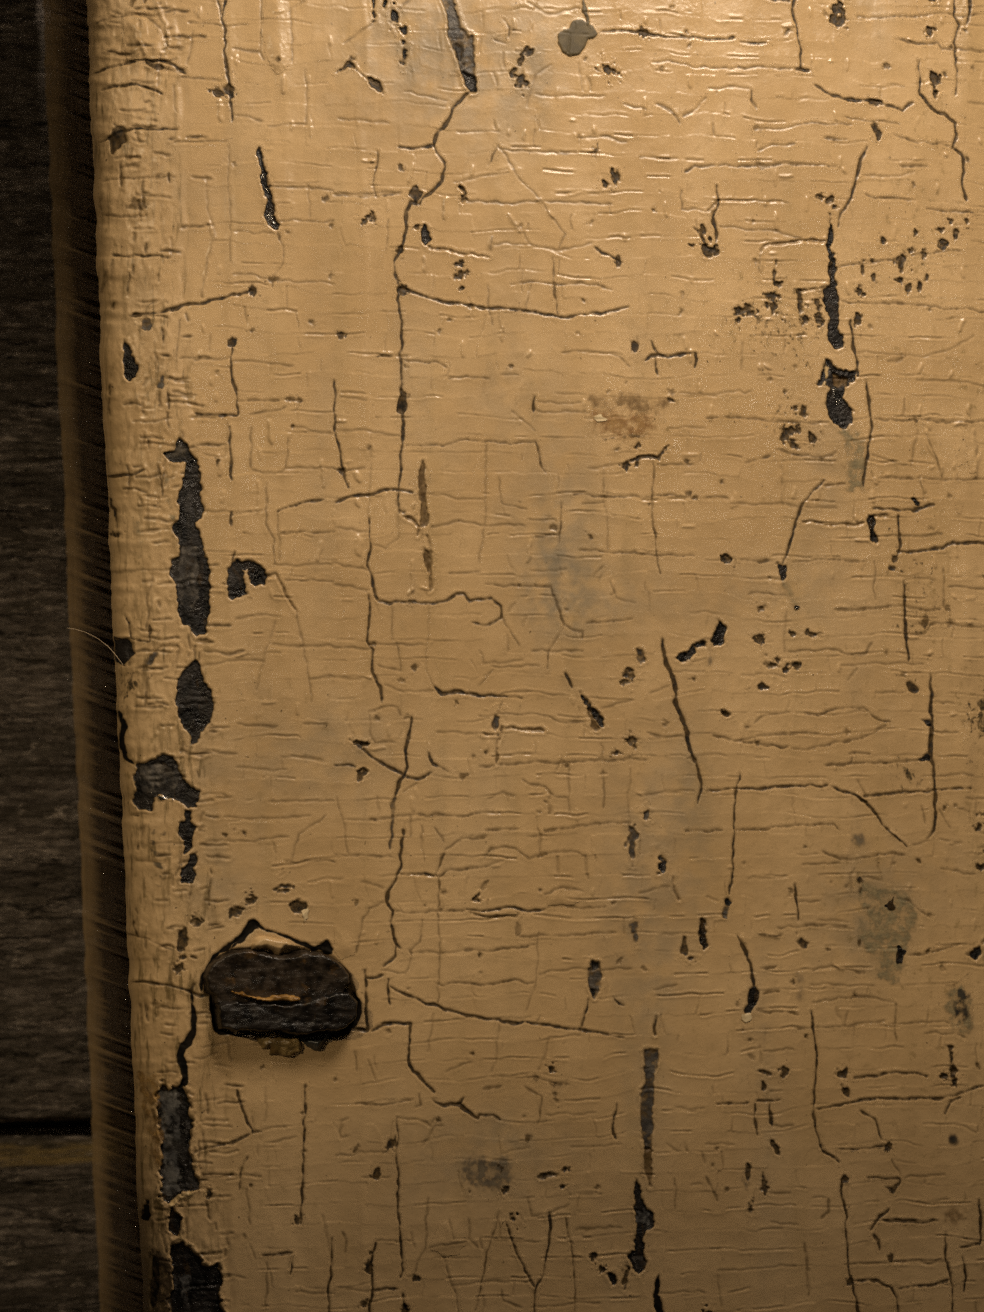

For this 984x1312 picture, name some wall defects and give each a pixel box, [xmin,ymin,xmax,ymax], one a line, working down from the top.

crack [95,0,237,120]
crack [603,0,975,214]
crack [294,93,627,700]
peeling [796,195,861,429]
peeling [164,439,211,636]
peeling [132,754,200,883]
peeling [175,660,213,744]
crack [661,319,984,1312]
damp [967,689,984,737]
rust [231,991,300,1002]
crack [136,717,622,1312]
peeling [138,1071,223,1312]